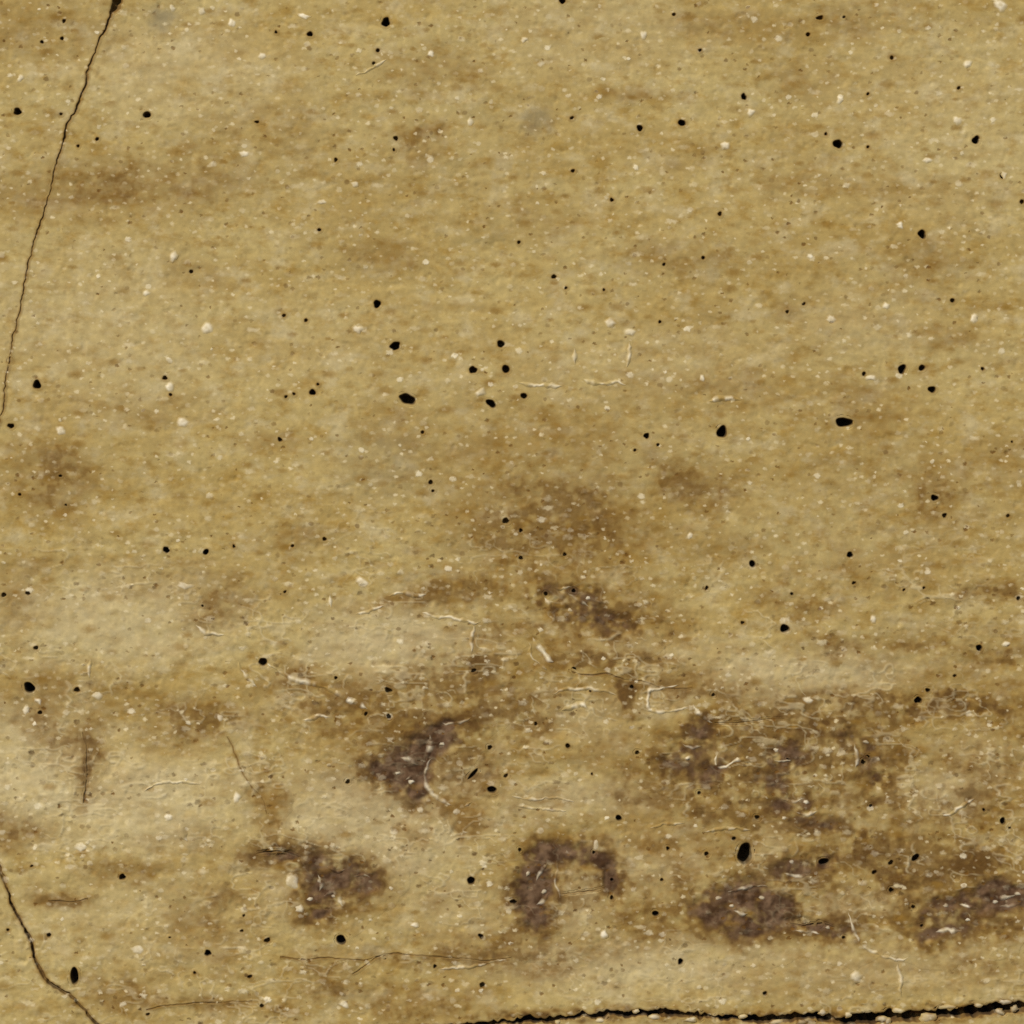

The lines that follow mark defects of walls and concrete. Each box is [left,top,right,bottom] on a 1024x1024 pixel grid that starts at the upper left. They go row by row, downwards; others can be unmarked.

crack [0,0,125,429]
crack [0,861,103,1024]
crack [390,998,1024,1024]